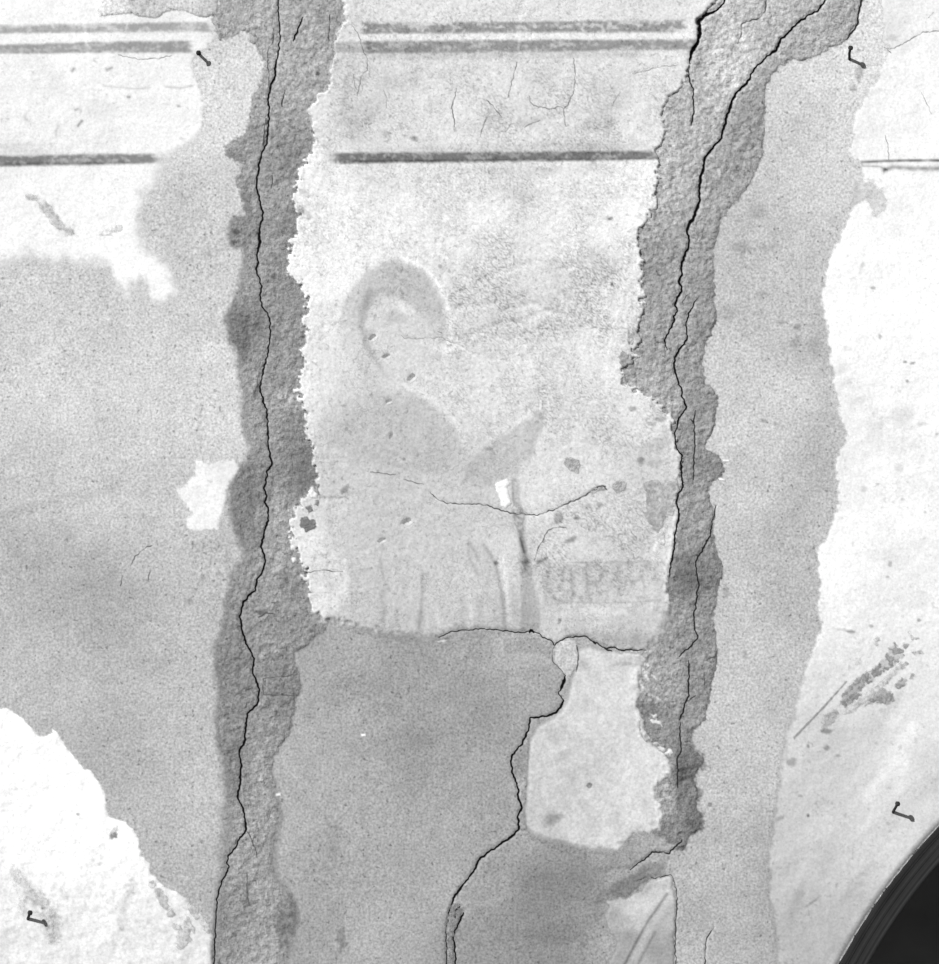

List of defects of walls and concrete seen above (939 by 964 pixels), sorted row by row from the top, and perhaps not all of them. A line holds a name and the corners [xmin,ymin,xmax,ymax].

crack [634,0,725,124]
flaking render [619,333,637,384]
crack [664,0,826,788]
crack [213,0,303,964]
flaking render [300,484,319,532]
crack [374,472,606,550]
crack [439,628,643,964]
flaking render [639,714,673,755]
peeling [794,637,921,738]
crack [630,840,682,964]